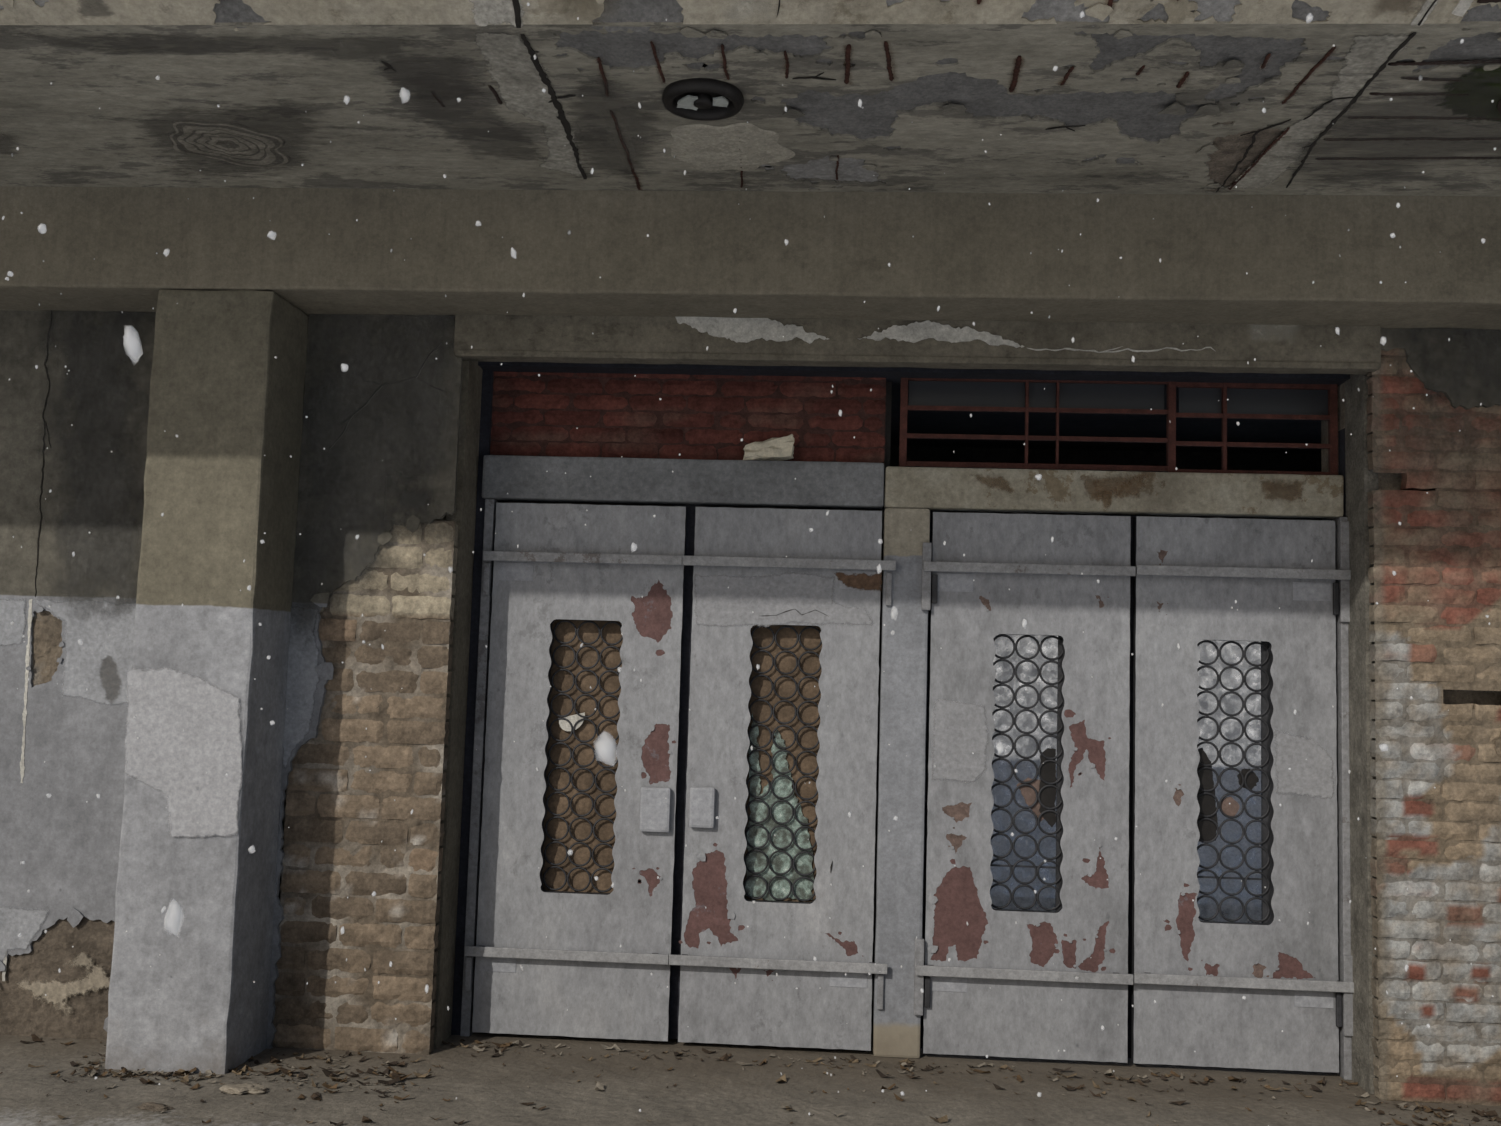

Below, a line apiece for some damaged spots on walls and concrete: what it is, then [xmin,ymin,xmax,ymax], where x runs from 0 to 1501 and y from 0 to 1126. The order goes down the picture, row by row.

peeling [555,0,1344,191]
peeling [1398,3,1501,71]
peeling [676,317,829,344]
peeling [857,320,1025,348]
flaking render [272,514,458,1055]
flaking render [1366,348,1501,1106]
flaking render [0,907,115,1040]